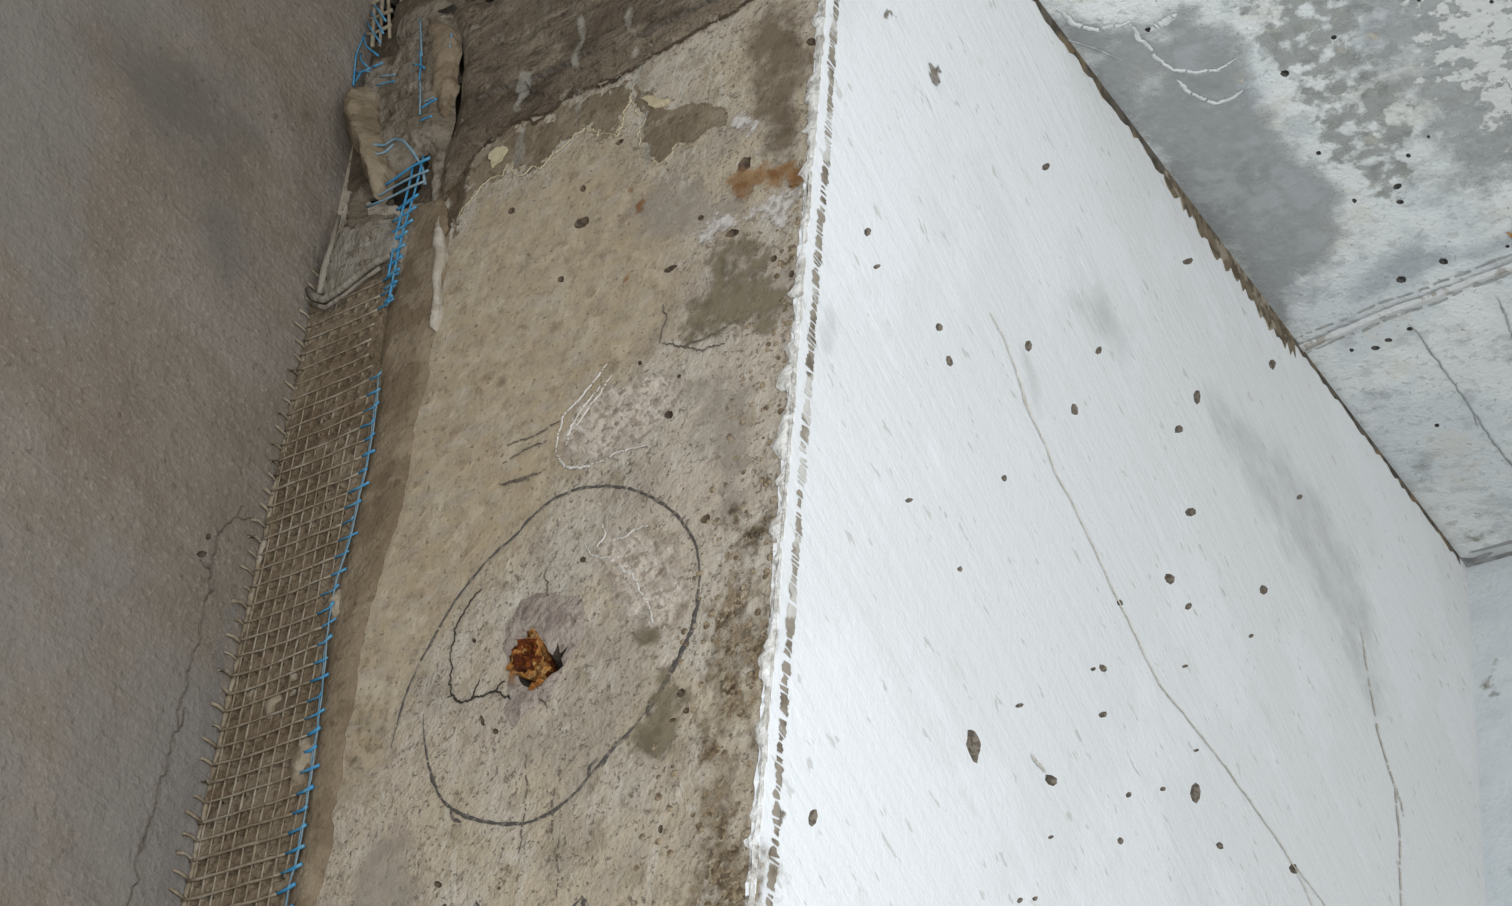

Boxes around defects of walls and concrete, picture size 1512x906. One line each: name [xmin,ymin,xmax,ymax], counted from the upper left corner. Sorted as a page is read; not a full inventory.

peeling [305,0,728,332]
crack [444,0,750,236]
spalling [738,157,751,172]
corrosion [727,161,803,198]
damp [1060,0,1512,322]
crack [766,0,840,906]
crack [126,505,254,906]
crack [447,588,547,715]
corrosion [505,628,553,691]